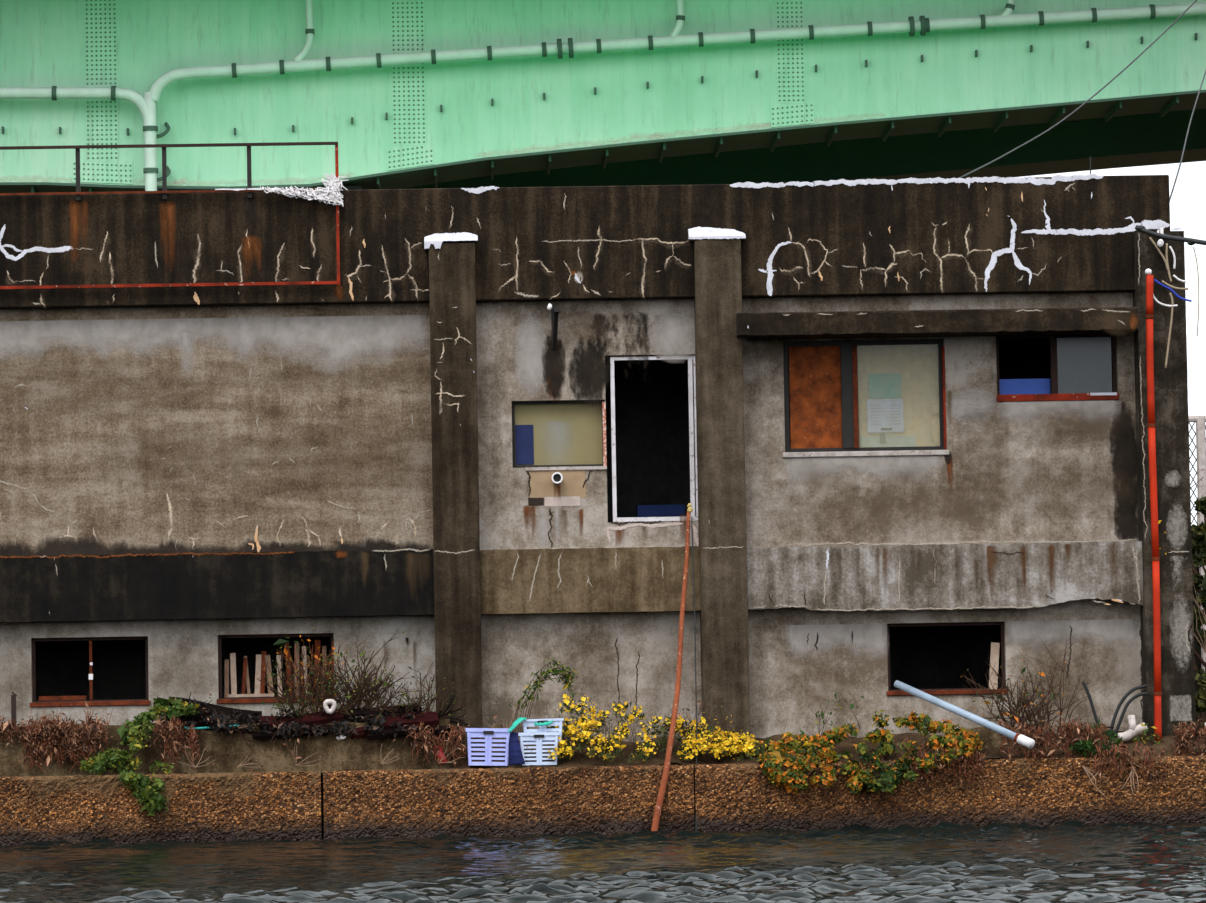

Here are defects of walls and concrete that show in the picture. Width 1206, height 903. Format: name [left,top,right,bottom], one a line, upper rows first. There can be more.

crack [0,224,115,305]
rust [70,202,87,250]
crack [500,229,690,297]
crack [758,200,1183,296]